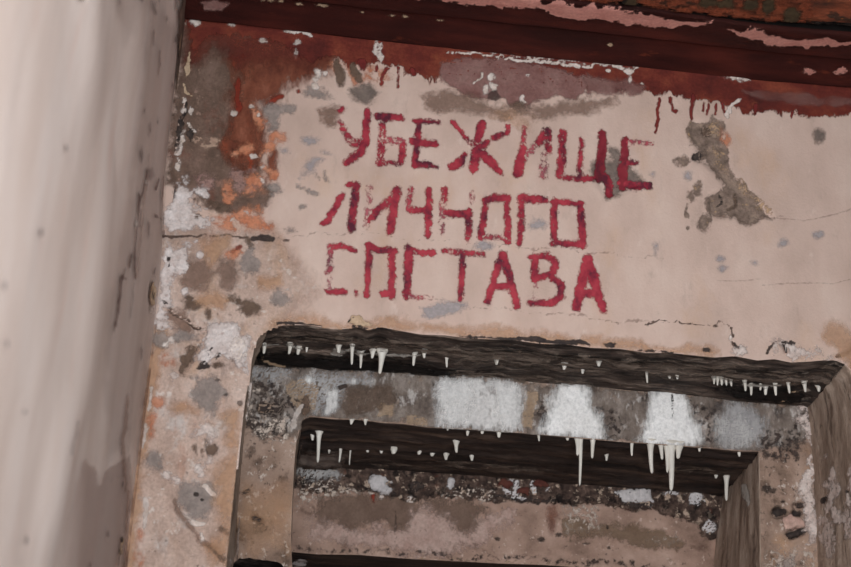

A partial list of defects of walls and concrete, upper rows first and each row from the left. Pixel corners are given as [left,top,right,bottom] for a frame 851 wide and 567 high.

peeling [201,0,229,11]
peeling [442,0,713,29]
peeling [185,19,851,230]
crack [114,52,290,333]
efflorescence [331,348,427,358]
crack [645,319,736,349]
peeling [119,227,314,567]
efflorescence [433,375,522,433]
efflorescence [538,384,604,439]
efflorescence [643,391,702,446]
spalling [294,440,723,562]
peeling [771,464,851,558]